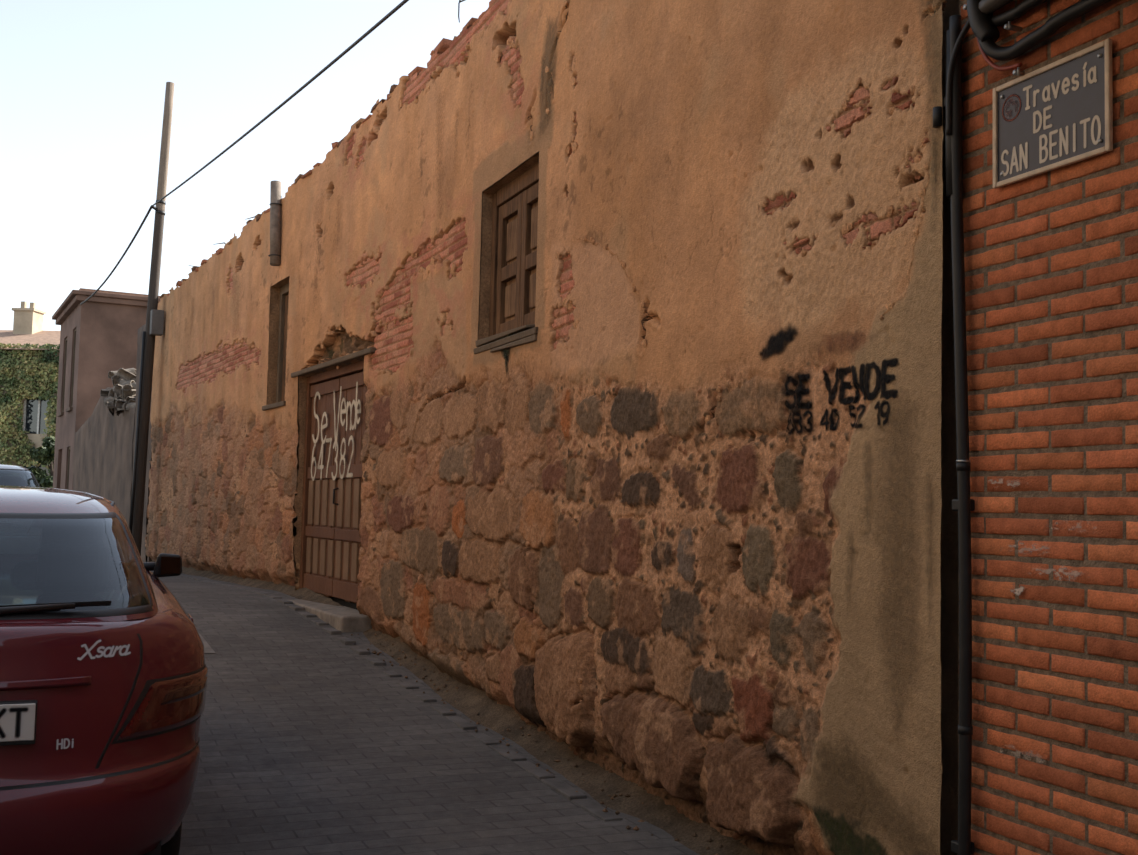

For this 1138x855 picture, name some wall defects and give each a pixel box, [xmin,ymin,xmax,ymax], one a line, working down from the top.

spalling [494,35,525,105]
spalling [825,77,920,138]
spalling [404,220,468,279]
spalling [763,192,795,216]
spalling [841,202,925,250]
spalling [552,250,579,349]
spalling [177,342,261,393]
spalling [317,305,414,372]